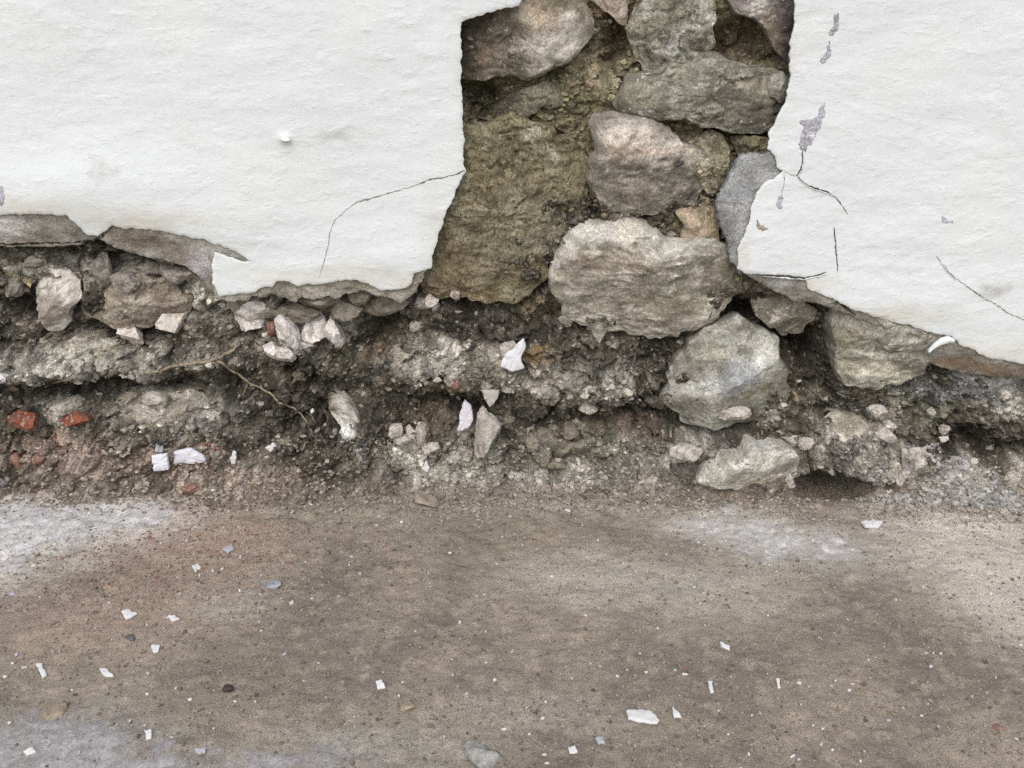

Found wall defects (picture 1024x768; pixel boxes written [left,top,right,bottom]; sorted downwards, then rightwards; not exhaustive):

crack [320,170,465,273]
flaking render [0,0,1024,512]
crack [762,151,848,280]
crack [936,256,1024,320]